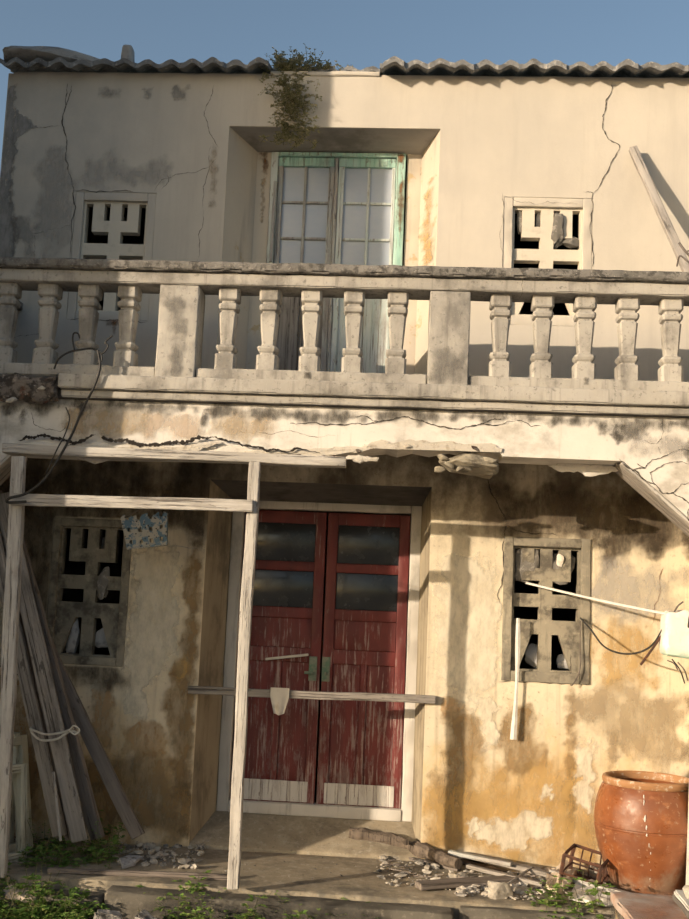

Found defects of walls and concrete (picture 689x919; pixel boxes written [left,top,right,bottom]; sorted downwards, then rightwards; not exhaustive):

crack [36,84,133,252]
crack [587,87,620,269]
corrosion [423,191,432,263]
spalling [0,373,59,404]
crack [18,413,540,453]
leakage [201,404,366,437]
spalling [243,439,502,479]
crack [620,423,689,521]
leakage [598,534,631,573]
leakage [112,543,202,835]
leakage [428,628,689,862]
peeling [468,811,552,851]